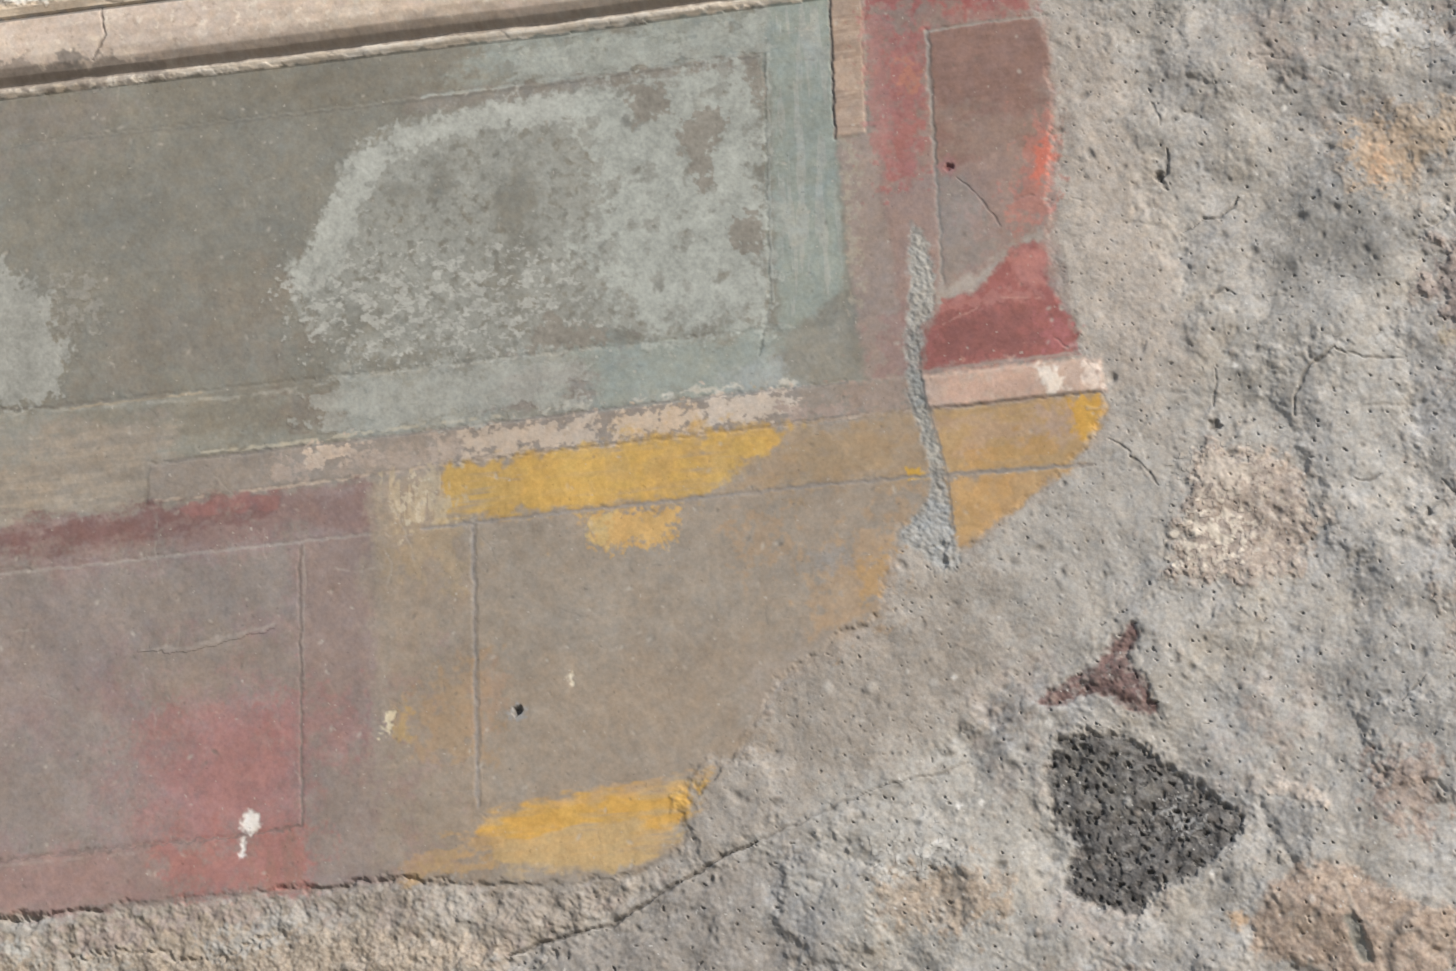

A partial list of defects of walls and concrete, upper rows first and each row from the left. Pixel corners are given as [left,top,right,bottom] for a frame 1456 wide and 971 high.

spalling [0,874,652,971]
crack [507,761,970,958]